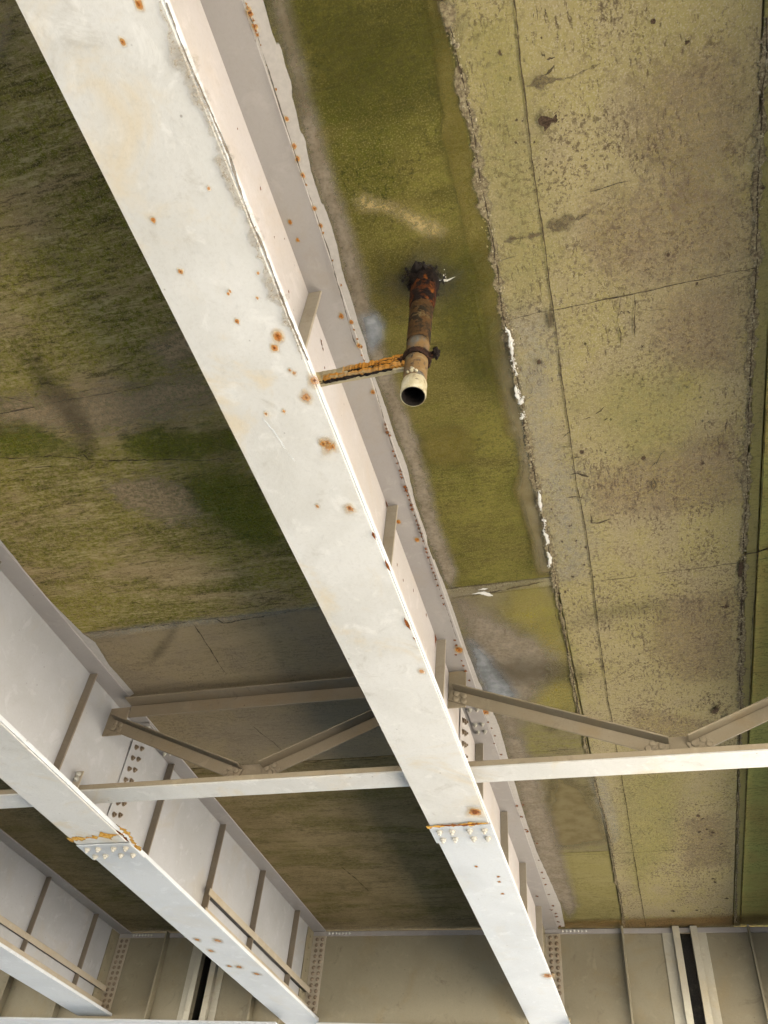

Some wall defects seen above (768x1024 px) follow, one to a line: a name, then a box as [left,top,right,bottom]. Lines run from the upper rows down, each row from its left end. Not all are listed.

damp [428,1,552,576]
corrosion [271,332,283,351]
corrosion [301,314,405,402]
corrosion [426,809,488,829]
corrosion [66,826,141,851]